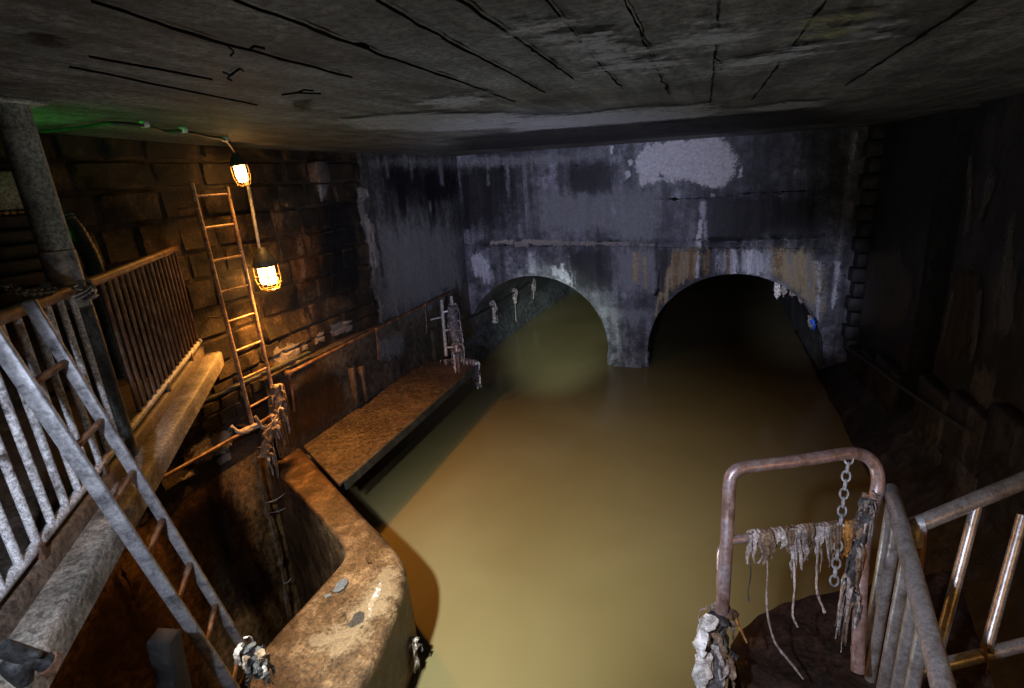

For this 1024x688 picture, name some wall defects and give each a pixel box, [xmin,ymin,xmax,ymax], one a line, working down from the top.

crack [69,0,352,106]
crack [233,0,545,102]
crack [456,0,574,80]
crack [624,0,670,95]
crack [708,0,721,103]
crack [751,0,826,101]
crack [845,0,977,86]
damp [372,146,673,316]
rust [655,248,710,316]
damp [686,193,818,275]
rust [771,247,826,322]
damp [831,231,843,310]